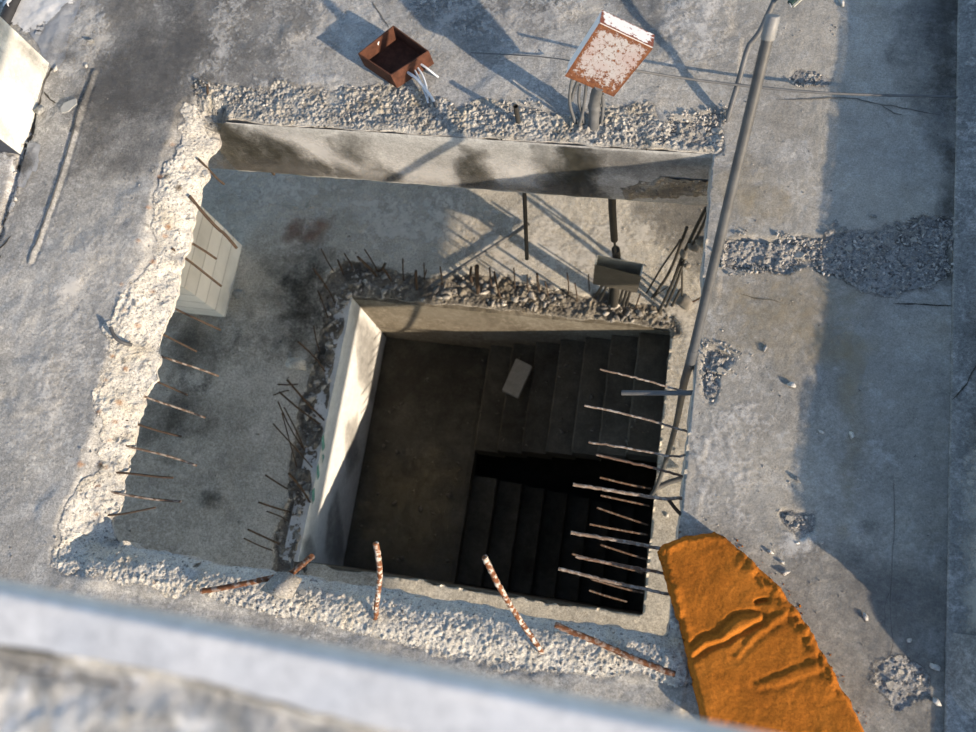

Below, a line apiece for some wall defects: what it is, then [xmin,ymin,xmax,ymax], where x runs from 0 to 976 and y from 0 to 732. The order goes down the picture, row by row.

damp [69,0,290,145]
crack [0,68,55,257]
damp [210,123,666,302]
spalling [721,214,960,298]
spalling [47,79,727,688]
damp [654,282,762,508]
spalling [698,340,743,405]